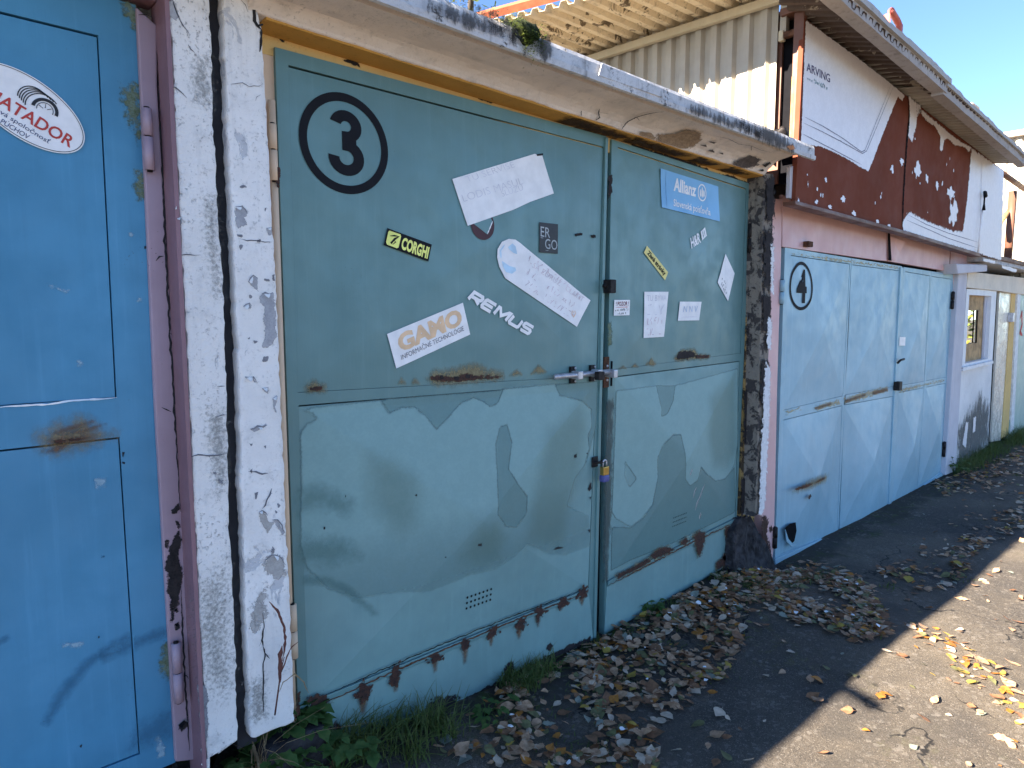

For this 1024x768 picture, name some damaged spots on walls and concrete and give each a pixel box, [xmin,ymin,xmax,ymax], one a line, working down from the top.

peeling [890,158,958,227]
peeling [234,206,247,250]
peeling [243,274,277,362]
rust [430,365,545,385]
rust [43,420,101,451]
damp [957,395,990,464]
peeling [255,492,285,535]
peeling [164,503,183,630]
peeling [262,547,286,580]
rust [611,524,731,584]
rust [295,585,591,730]